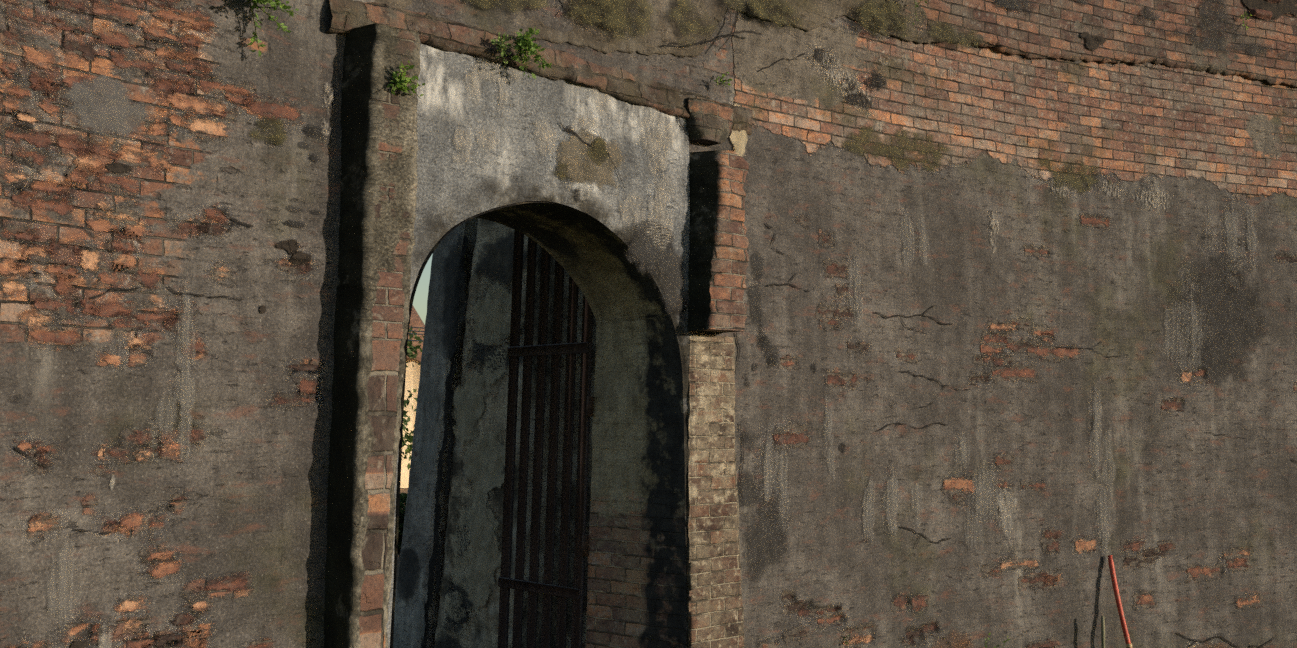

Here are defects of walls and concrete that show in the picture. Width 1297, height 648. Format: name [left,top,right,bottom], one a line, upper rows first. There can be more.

flaking render [732,11,1297,199]
spalling [0,0,305,367]
damp [1181,253,1266,385]
spalling [14,440,61,474]
spalling [90,426,207,475]
spalling [8,491,254,648]
spalling [781,589,878,648]